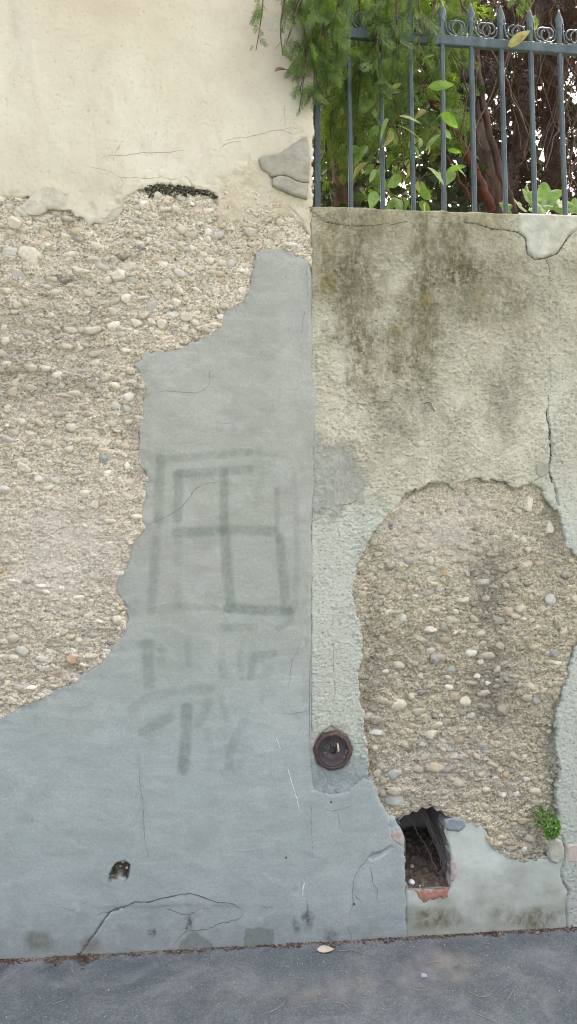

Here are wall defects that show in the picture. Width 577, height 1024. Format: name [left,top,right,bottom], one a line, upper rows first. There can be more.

crack [92,145,192,189]
spalling [0,137,313,719]
damp [414,215,474,305]
crack [465,222,575,502]
spalling [348,461,577,863]
crack [66,893,274,954]